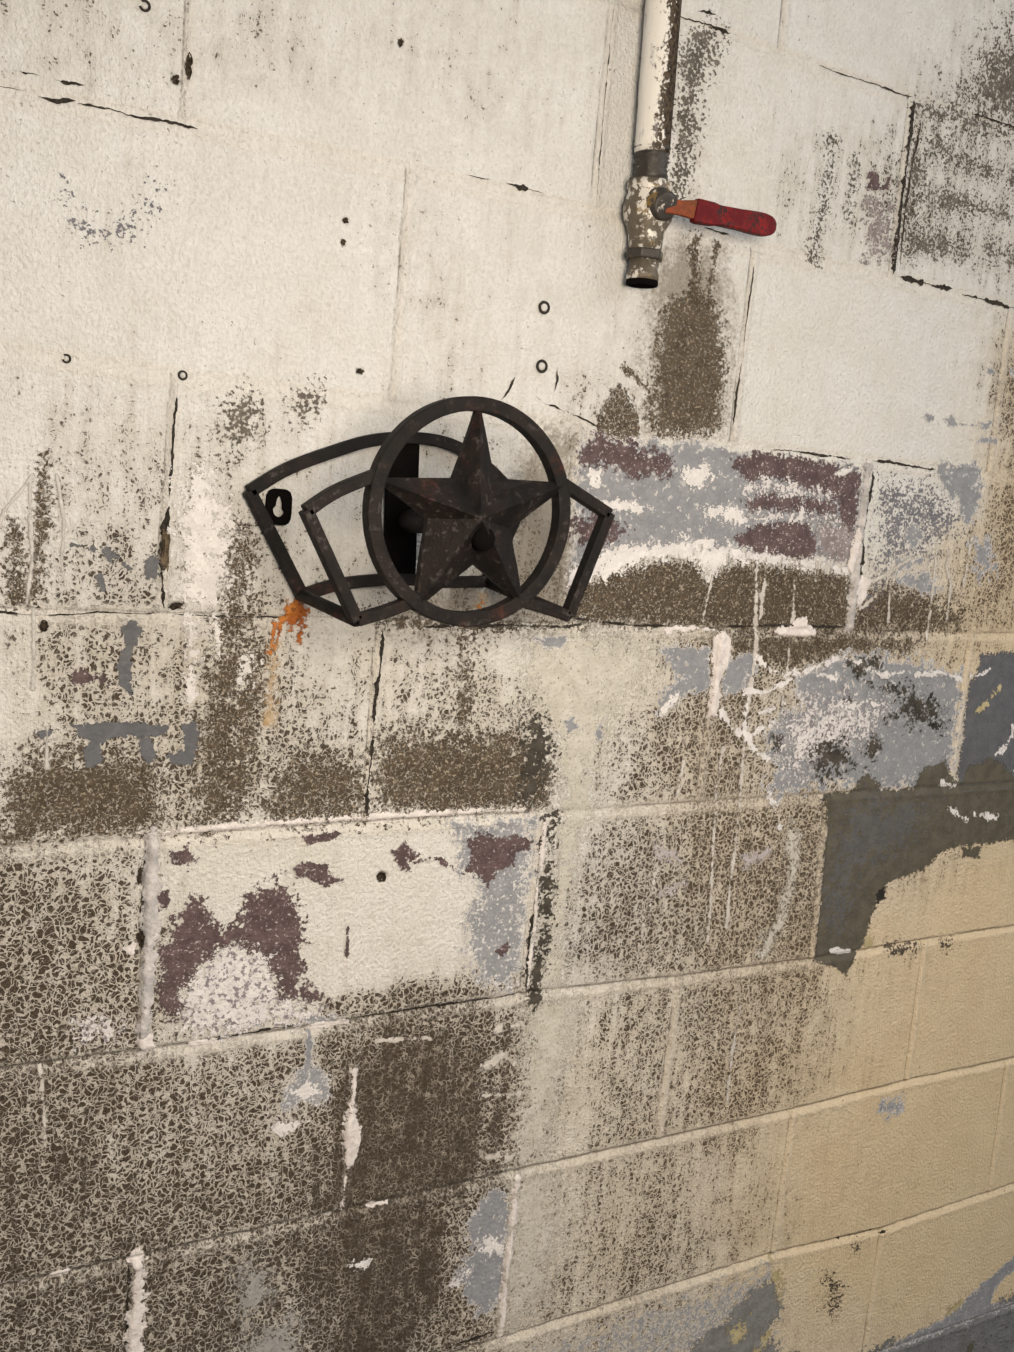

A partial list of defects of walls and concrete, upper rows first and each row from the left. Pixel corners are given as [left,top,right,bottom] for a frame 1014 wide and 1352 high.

leakage [668,10,732,200]
leakage [802,130,865,269]
leakage [897,10,1014,275]
leakage [596,229,733,442]
peeling [563,413,1004,615]
rust [263,599,310,726]
peeling [122,831,347,1138]
peeling [377,810,542,999]
leakage [0,373,974,1352]
peeling [655,624,1014,979]
peeling [507,1251,800,1352]
peeling [861,1256,1014,1352]